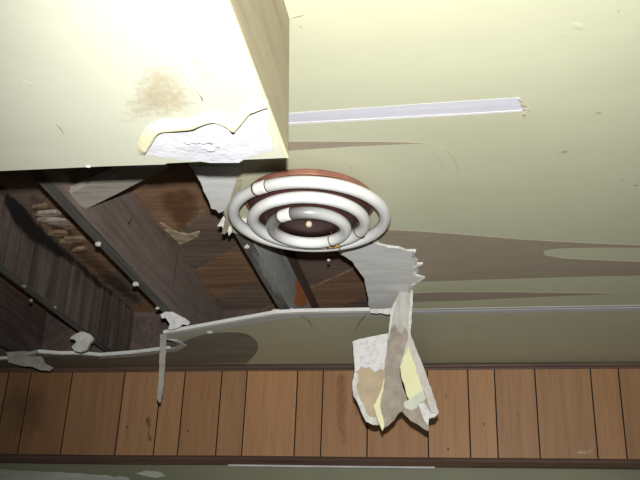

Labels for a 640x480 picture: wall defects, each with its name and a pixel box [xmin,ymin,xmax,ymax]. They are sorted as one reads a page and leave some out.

peeling [137,100,277,235]
rust [294,280,307,306]
peeling [338,230,640,310]